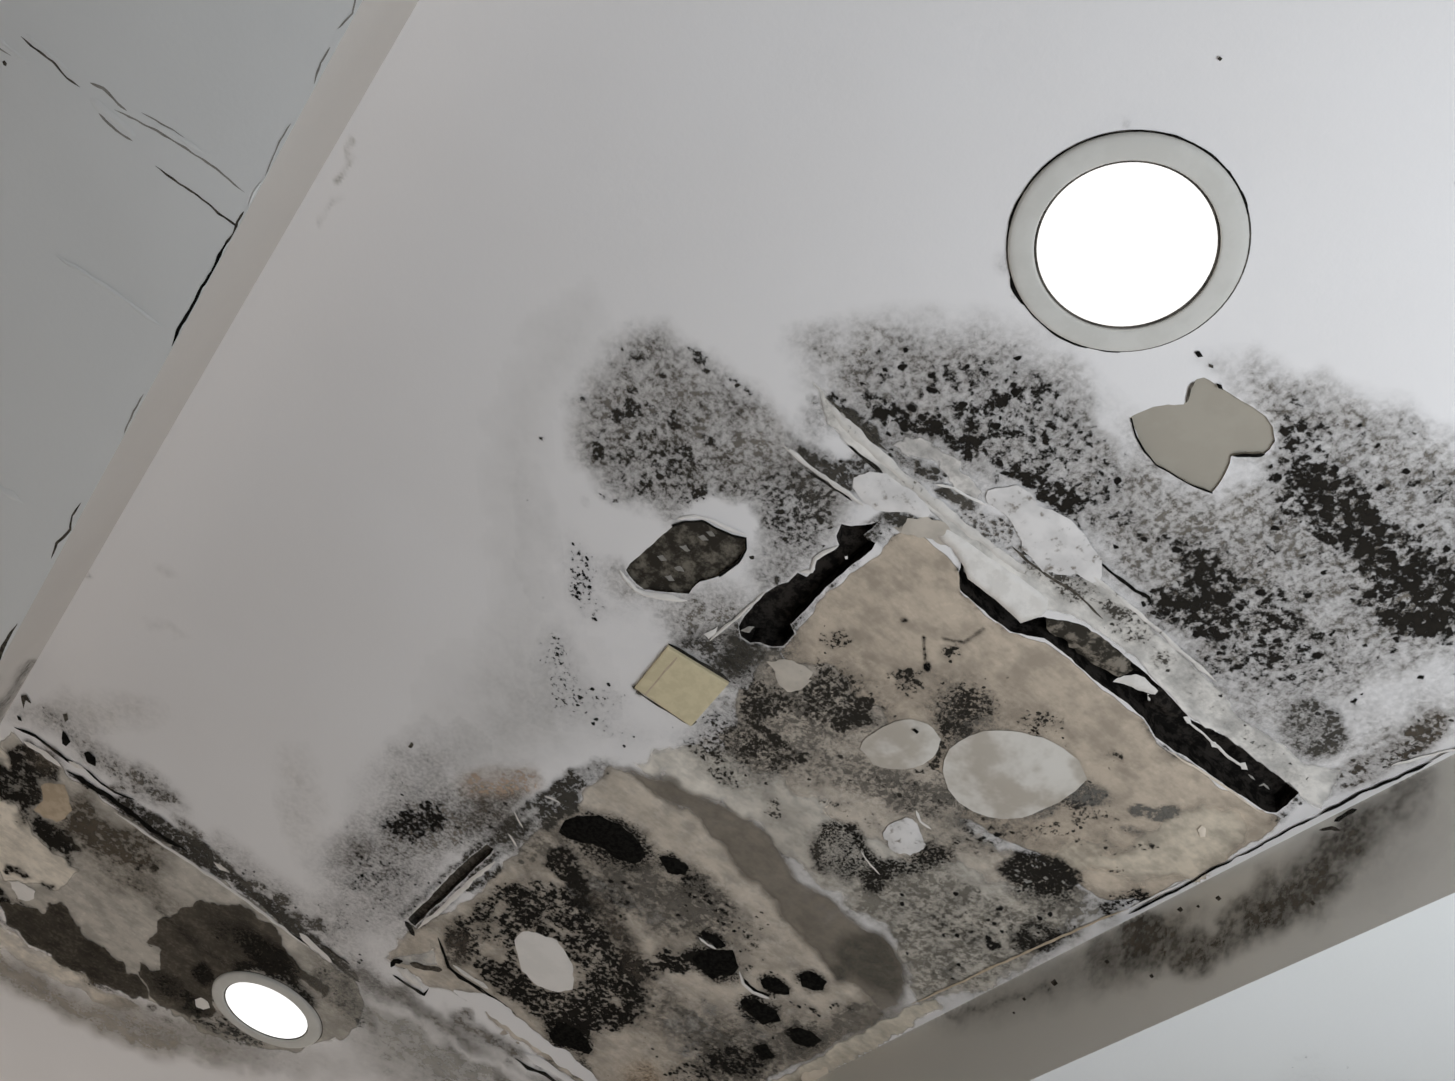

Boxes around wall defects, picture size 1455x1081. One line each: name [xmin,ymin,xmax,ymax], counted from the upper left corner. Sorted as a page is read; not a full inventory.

crack [314,0,356,84]
crack [0,33,290,345]
damp [1007,130,1248,245]
crack [0,624,17,660]
crack [51,503,81,558]
spalling [0,732,364,1053]
damp [0,625,1398,1081]
mould [580,338,845,578]
spalling [388,437,1280,1081]
damp [1010,275,1125,353]
damp [813,327,1455,791]
peeling [1130,351,1275,494]